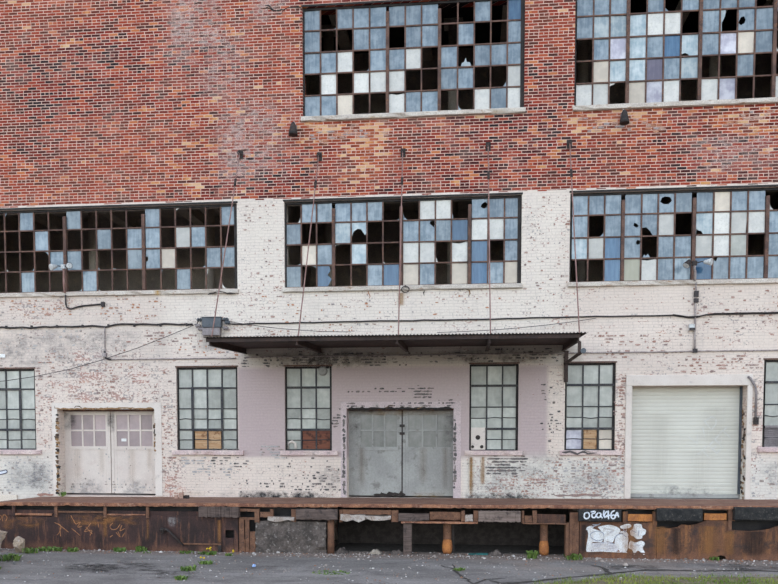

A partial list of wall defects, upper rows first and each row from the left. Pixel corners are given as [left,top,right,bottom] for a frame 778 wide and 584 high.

peeling [143,330,249,367]
peeling [594,332,669,361]
peeling [678,352,762,373]
spalling [0,328,157,494]
peeling [143,392,248,487]
spalling [260,403,365,495]
spalling [740,409,778,499]